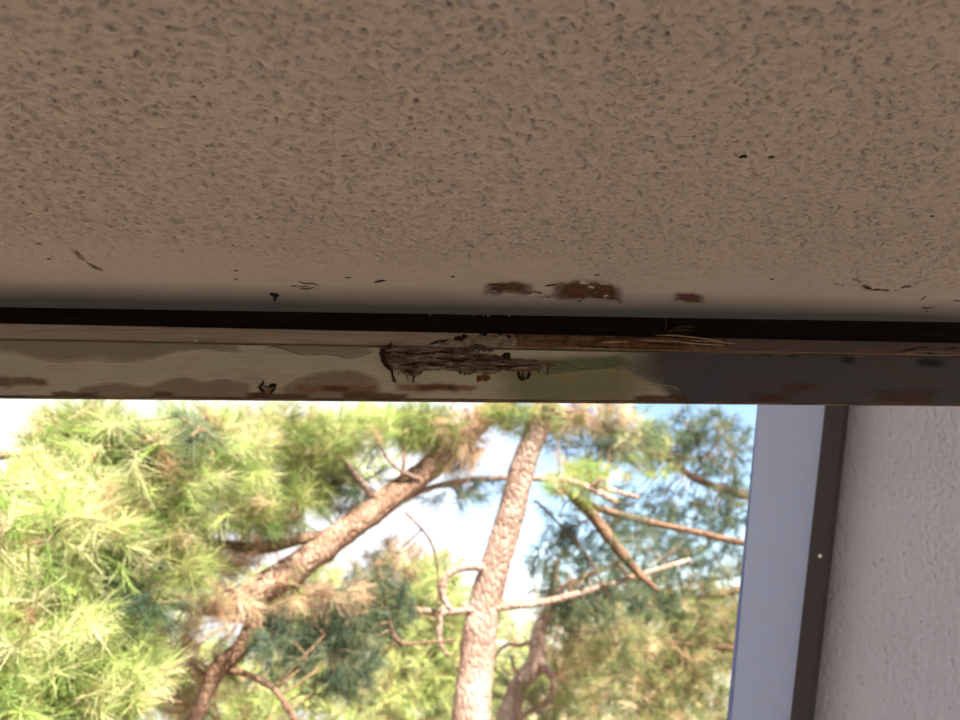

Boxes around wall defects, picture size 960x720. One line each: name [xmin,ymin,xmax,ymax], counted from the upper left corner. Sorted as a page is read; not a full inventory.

peeling [484,274,619,302]
peeling [676,294,701,304]